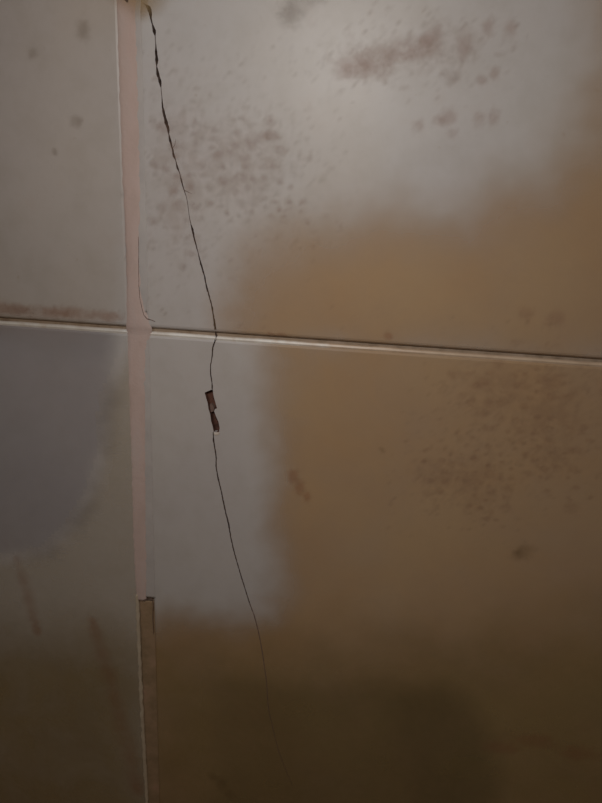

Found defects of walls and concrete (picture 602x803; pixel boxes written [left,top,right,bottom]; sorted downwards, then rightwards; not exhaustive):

crack [125,0,217,389]
crack [213,433,292,784]
damp [155,162,602,803]